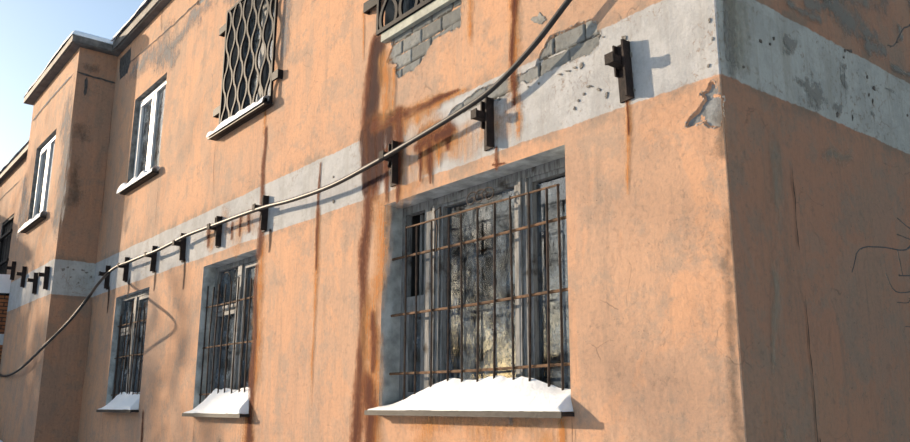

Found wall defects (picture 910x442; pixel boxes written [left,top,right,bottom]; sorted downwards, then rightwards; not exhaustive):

spalling [387,0,462,78]
corrosion [509,0,520,136]
spalling [447,19,604,115]
peeling [531,12,547,24]
spalling [684,79,726,129]
corrosion [230,112,271,442]
corrosion [349,13,466,442]
crack [805,297,821,442]